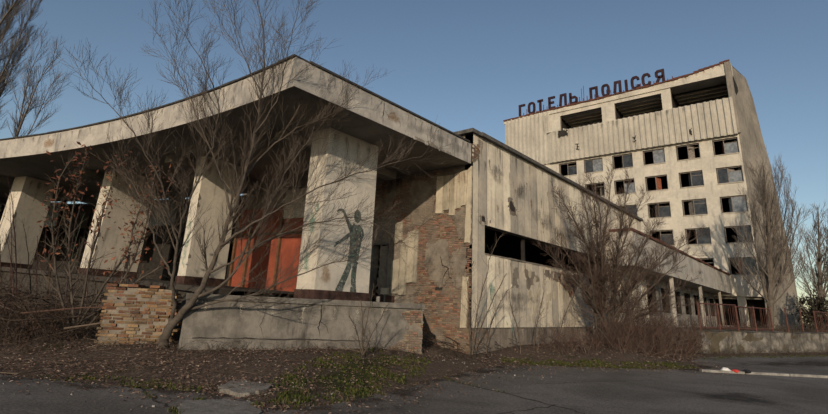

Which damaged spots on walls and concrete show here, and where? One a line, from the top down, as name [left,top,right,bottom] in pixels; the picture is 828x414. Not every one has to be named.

flaking render [372,171,492,355]